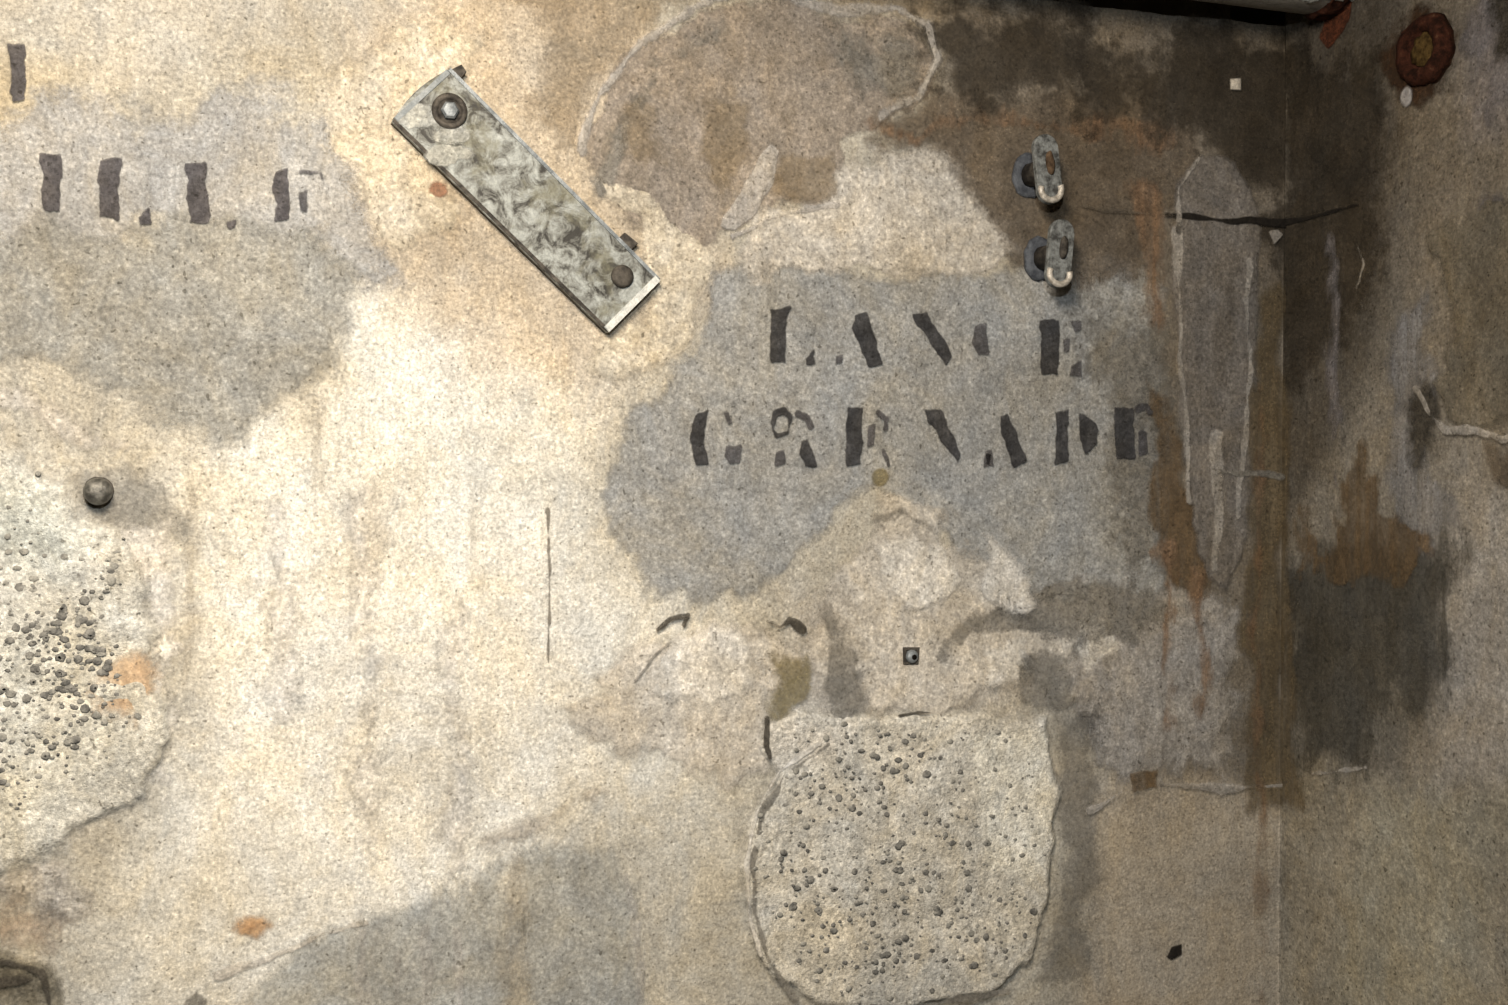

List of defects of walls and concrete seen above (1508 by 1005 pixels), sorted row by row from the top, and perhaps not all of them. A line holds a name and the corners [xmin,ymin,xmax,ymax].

corrosion [1320,3,1351,48]
water stain [881,0,1444,571]
crack [1082,204,1358,244]
peeling [123,526,179,728]
corrosion [1151,394,1209,611]
water stain [1286,304,1469,763]